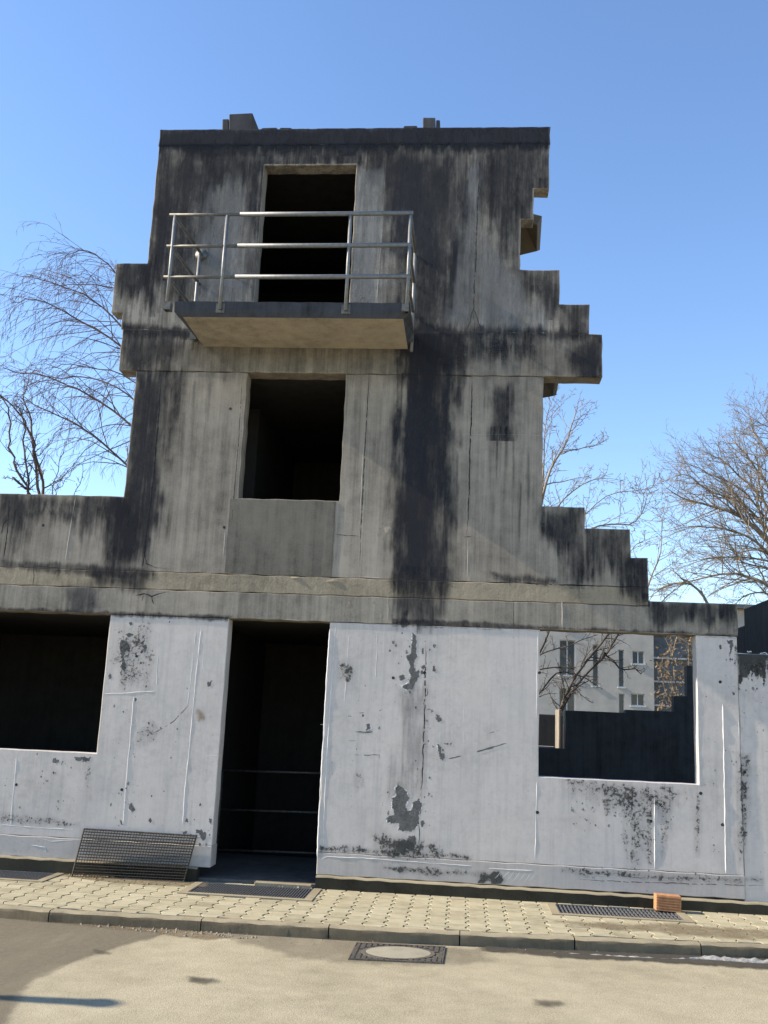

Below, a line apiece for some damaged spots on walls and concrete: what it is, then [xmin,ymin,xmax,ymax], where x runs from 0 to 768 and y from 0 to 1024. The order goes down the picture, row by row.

leakage [118,127,602,629]
leakage [1,324,191,689]
leakage [541,507,735,636]
peeling [108,622,147,683]
peeling [389,625,442,722]
peeling [718,626,767,703]
peeling [378,776,448,863]